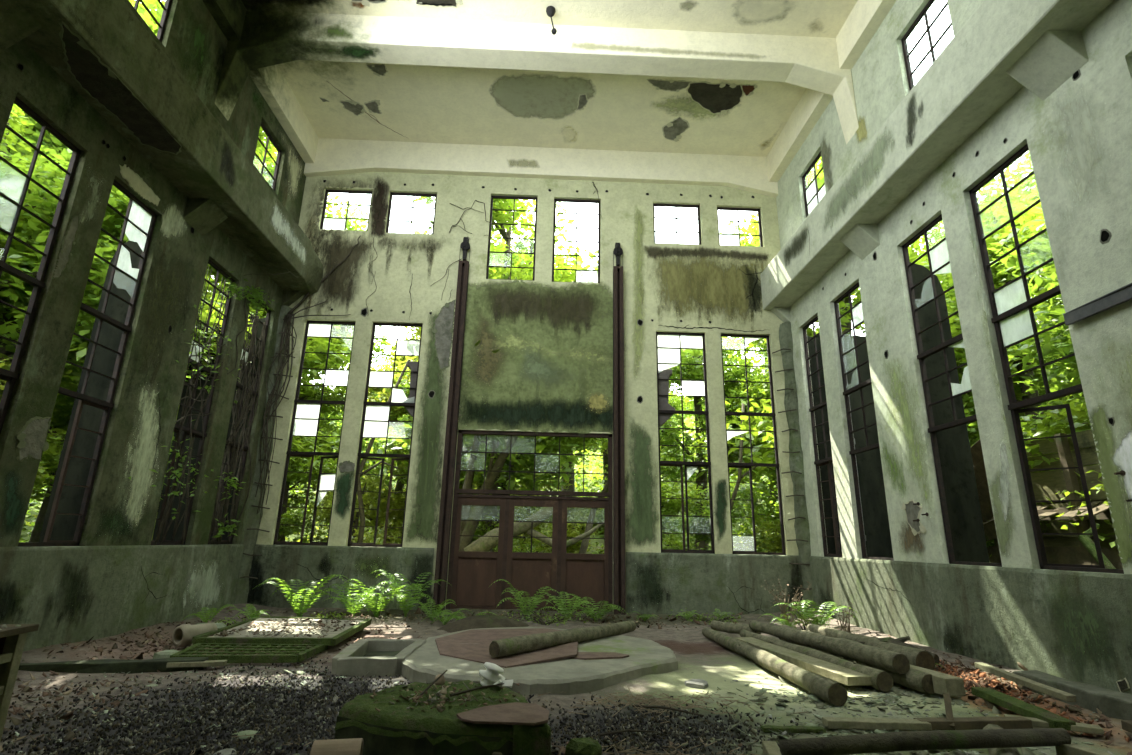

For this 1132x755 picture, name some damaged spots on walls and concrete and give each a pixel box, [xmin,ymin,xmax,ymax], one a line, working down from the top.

spalling [416,0,463,8]
water stain [301,20,378,58]
spalling [577,94,588,111]
flaking render [662,116,690,142]
spalling [647,79,758,114]
water stain [272,180,439,311]
water stain [633,212,768,372]
water stain [458,278,613,434]
water stain [407,314,446,542]
water stain [410,555,433,608]